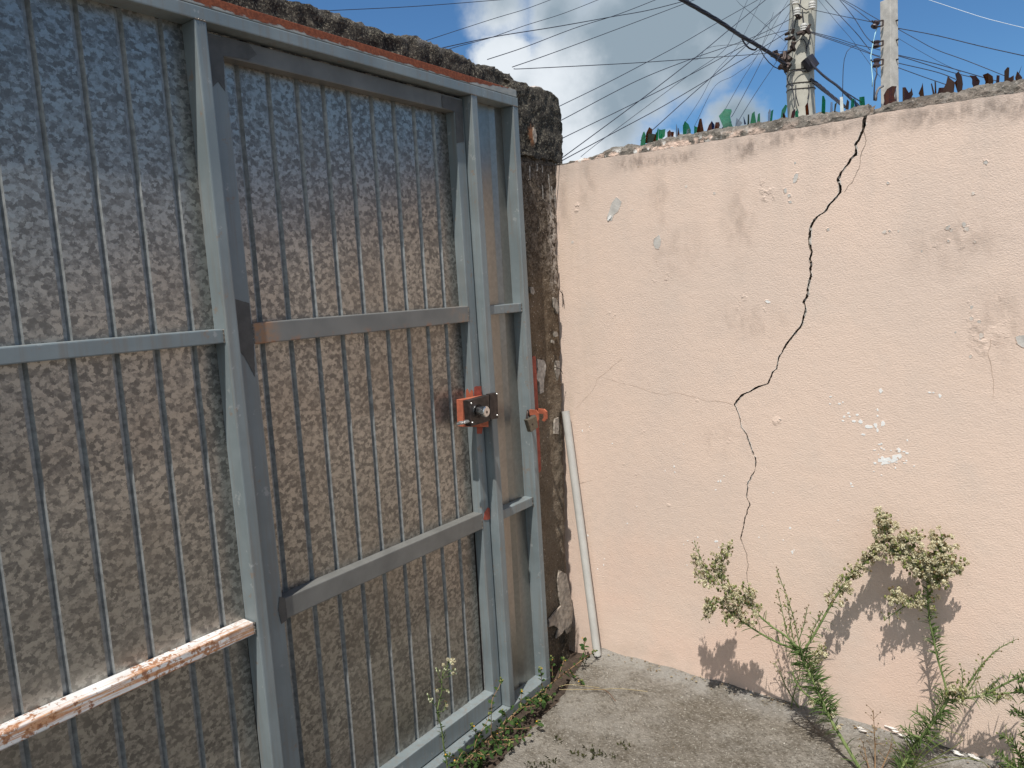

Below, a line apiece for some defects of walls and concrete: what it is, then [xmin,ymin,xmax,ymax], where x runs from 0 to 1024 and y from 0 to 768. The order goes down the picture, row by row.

crack [729,105,876,582]
peeling [829,396,915,476]
peeling [548,570,573,638]